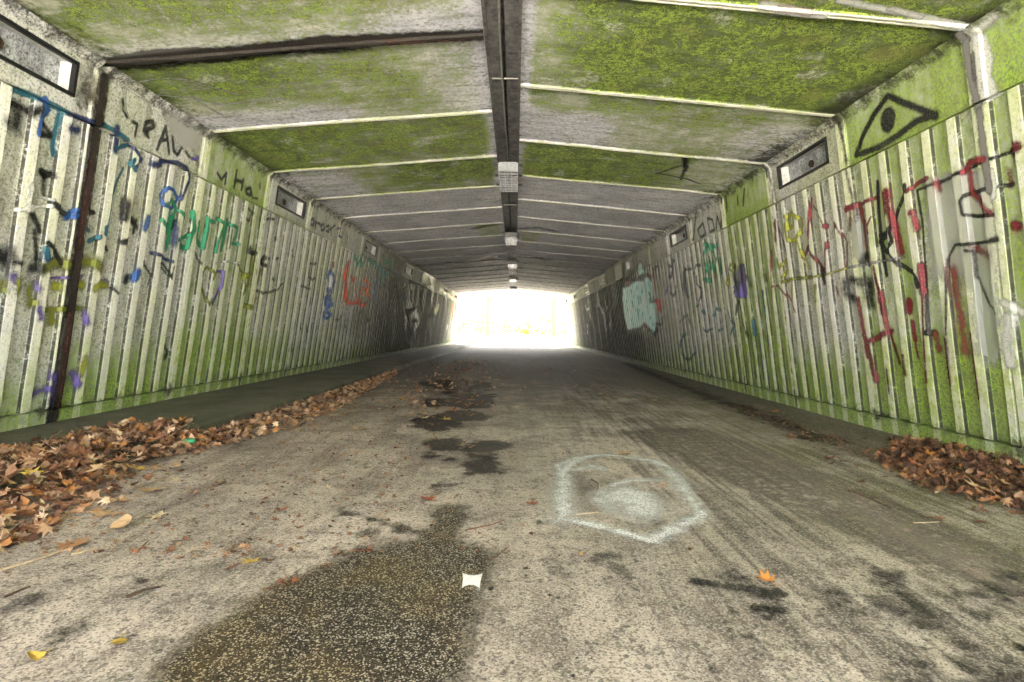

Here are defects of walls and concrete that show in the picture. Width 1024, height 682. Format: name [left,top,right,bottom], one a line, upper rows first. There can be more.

leakage [78,29,484,113]
corrosion [43,72,109,423]
leakage [832,118,858,222]
leakage [152,504,497,682]